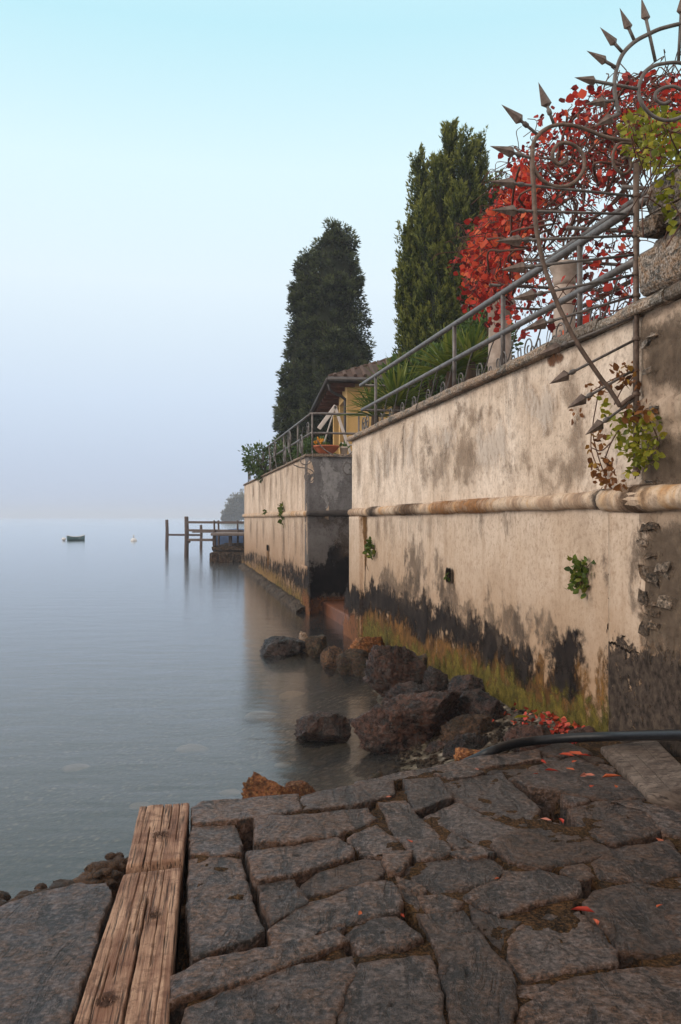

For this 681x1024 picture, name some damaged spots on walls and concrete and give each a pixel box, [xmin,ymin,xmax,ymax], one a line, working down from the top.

spalling [638,312,681,388]
water stain [435,403,513,482]
spalling [640,433,681,486]
water stain [241,551,311,600]
water stain [358,578,584,702]
peeling [606,520,681,758]